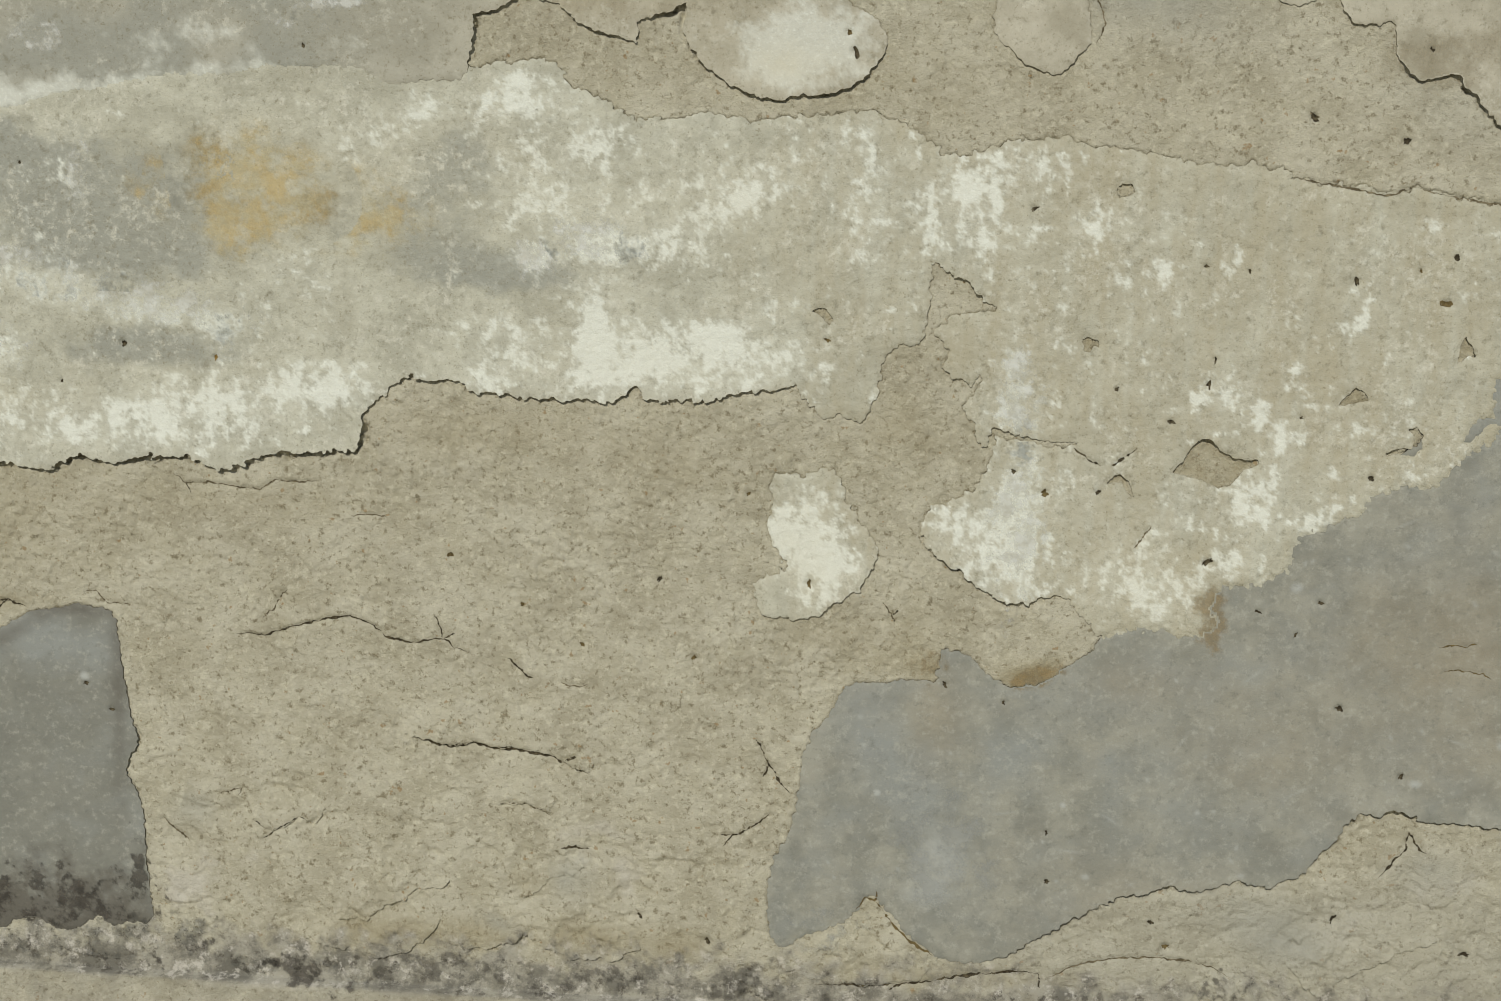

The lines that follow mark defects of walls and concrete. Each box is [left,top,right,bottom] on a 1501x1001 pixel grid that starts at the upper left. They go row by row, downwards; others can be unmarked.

spalling [457,0,1501,207]
crack [237,590,587,687]
spalling [0,246,1501,1001]
crack [417,737,589,775]
leakage [22,861,136,959]
leakage [115,854,168,915]
leakage [242,953,321,987]